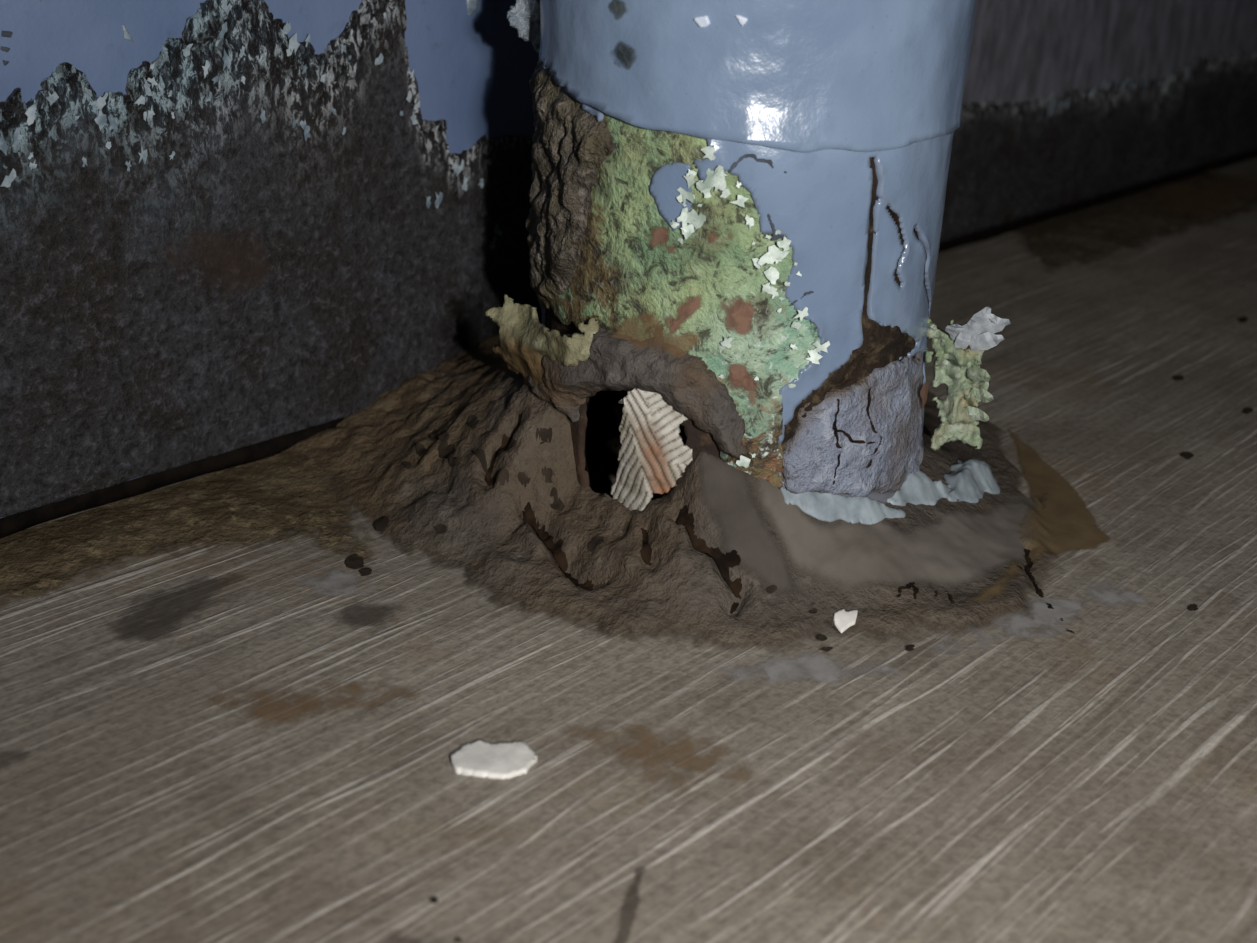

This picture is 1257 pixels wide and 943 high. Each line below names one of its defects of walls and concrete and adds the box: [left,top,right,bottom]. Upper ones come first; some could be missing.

peeling [0,0,1011,518]
corrosion [612,296,701,356]
corrosion [722,297,755,334]
crack [781,157,926,485]
corrosion [727,364,758,404]
spalling [374,516,389,531]
spalling [345,554,372,576]
damp [117,581,226,639]
damp [615,868,645,943]